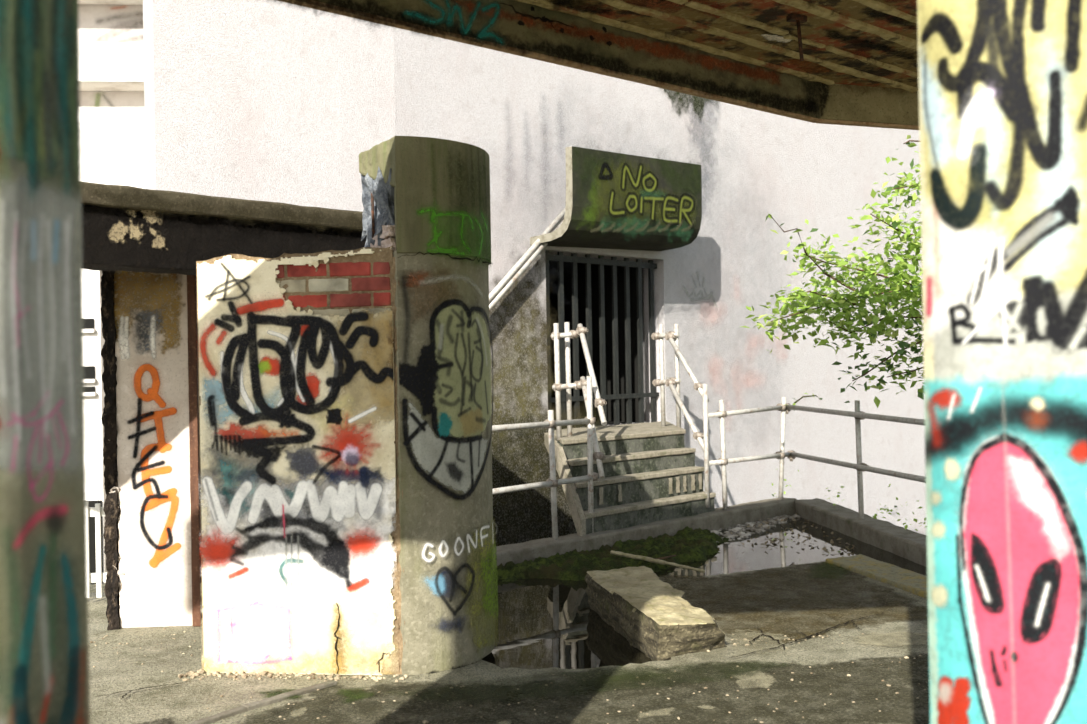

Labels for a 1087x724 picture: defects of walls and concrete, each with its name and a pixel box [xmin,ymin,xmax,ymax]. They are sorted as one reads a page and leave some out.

rust [625,0,685,13]
rust [456,2,780,85]
rust [785,59,831,73]
peeling [109,210,165,248]
spalling [274,166,396,317]
crack [334,603,342,674]
leakage [659,562,928,648]
leakage [242,654,930,724]